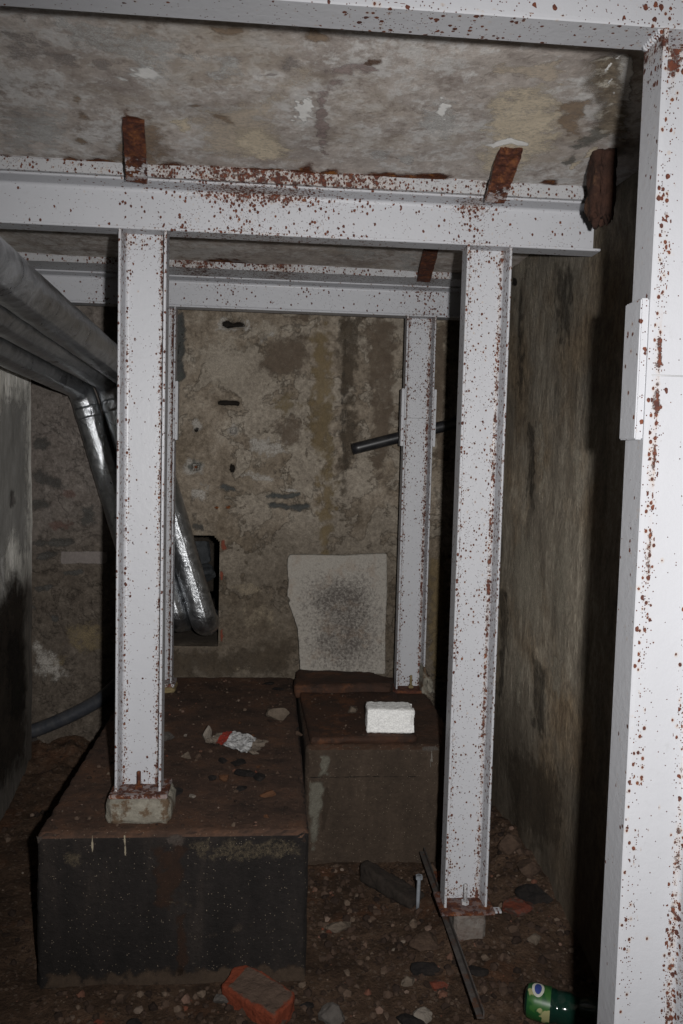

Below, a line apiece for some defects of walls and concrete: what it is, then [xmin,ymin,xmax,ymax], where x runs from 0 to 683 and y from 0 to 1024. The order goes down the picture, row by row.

rust [234,164,341,175]
rust [363,172,451,180]